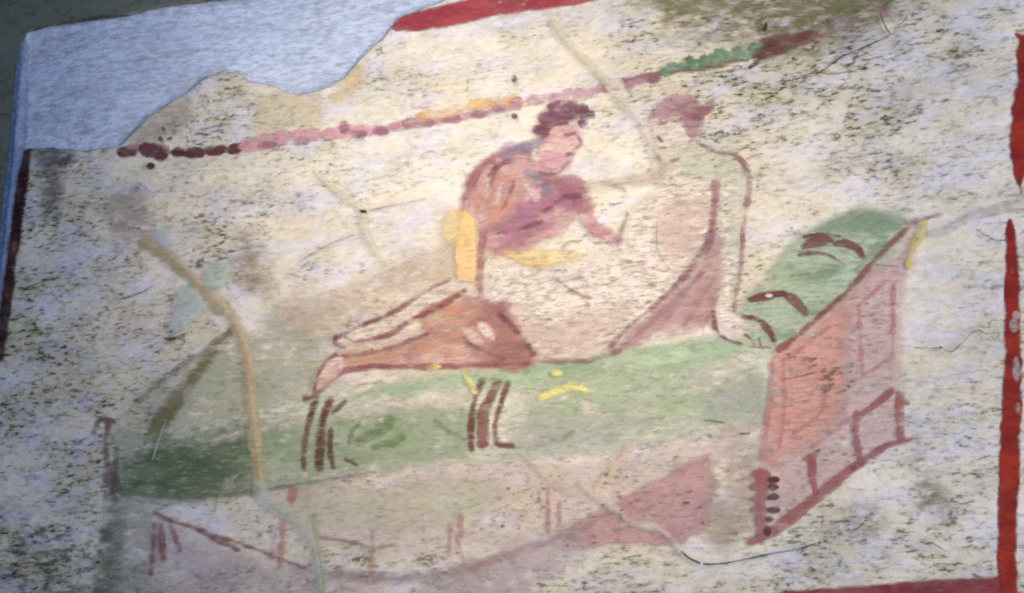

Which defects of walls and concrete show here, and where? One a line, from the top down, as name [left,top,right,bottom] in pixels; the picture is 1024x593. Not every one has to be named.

crack [817,14,905,74]
crack [521,445,816,565]